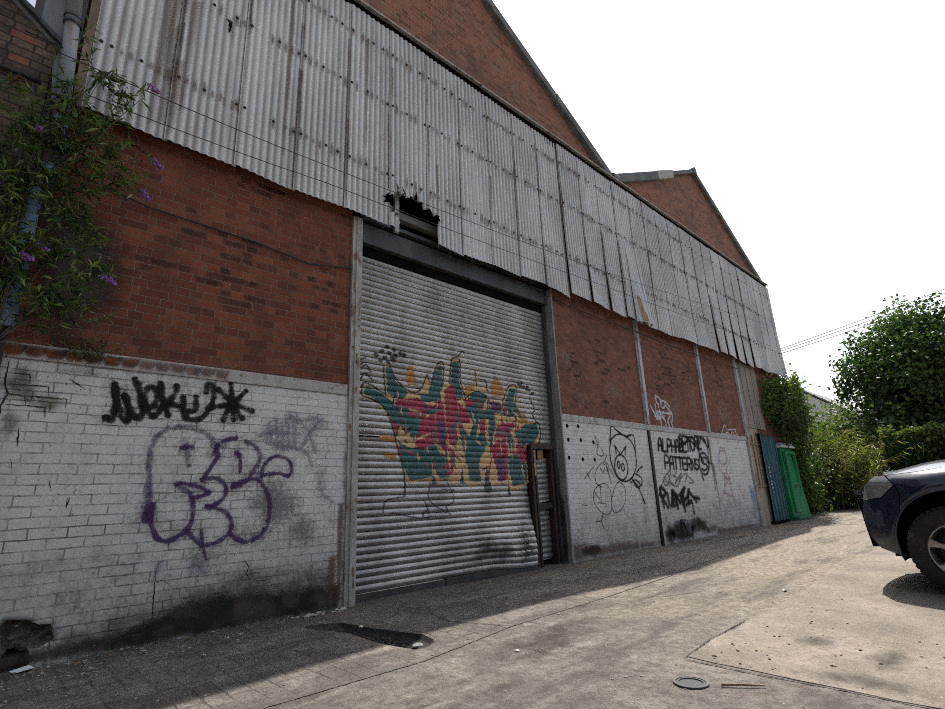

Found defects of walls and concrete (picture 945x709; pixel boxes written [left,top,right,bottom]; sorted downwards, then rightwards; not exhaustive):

peeling [382,183,441,244]
water stain [666,517,754,543]
spalling [0,619,54,670]
water stain [0,577,338,668]